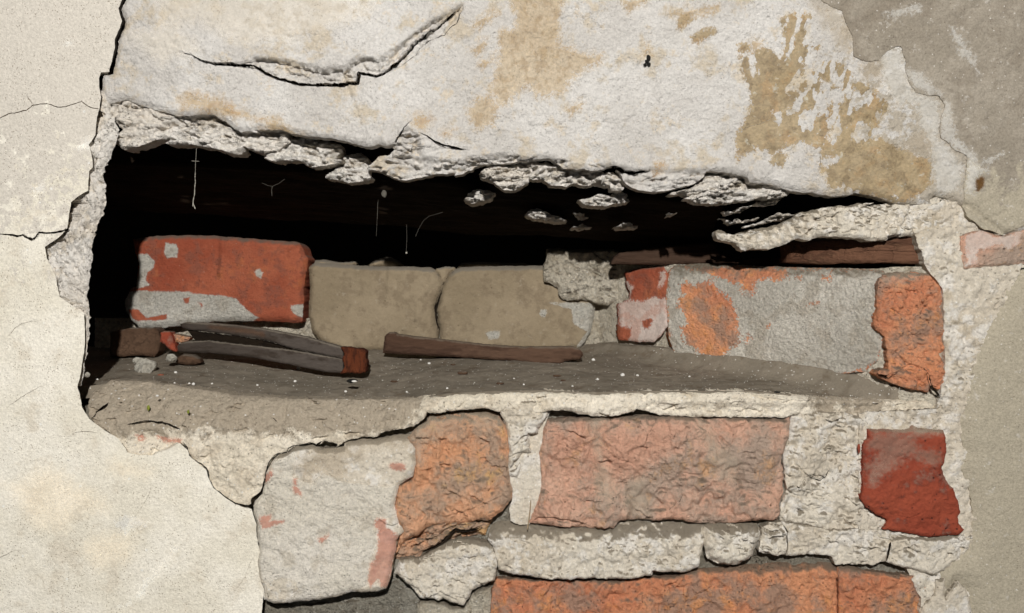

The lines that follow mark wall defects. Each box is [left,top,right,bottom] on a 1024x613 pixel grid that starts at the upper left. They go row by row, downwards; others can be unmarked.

crack [0,0,126,118]
crack [180,11,462,87]
leakage [810,0,853,50]
efflorescence [885,5,922,20]
efflorescence [952,26,980,73]
peeling [664,11,934,226]
leakage [863,48,1005,196]
crack [1,229,69,241]
flaking render [45,90,375,387]
spalling [436,266,456,282]
flaking render [464,161,630,232]
flaking render [612,222,638,231]